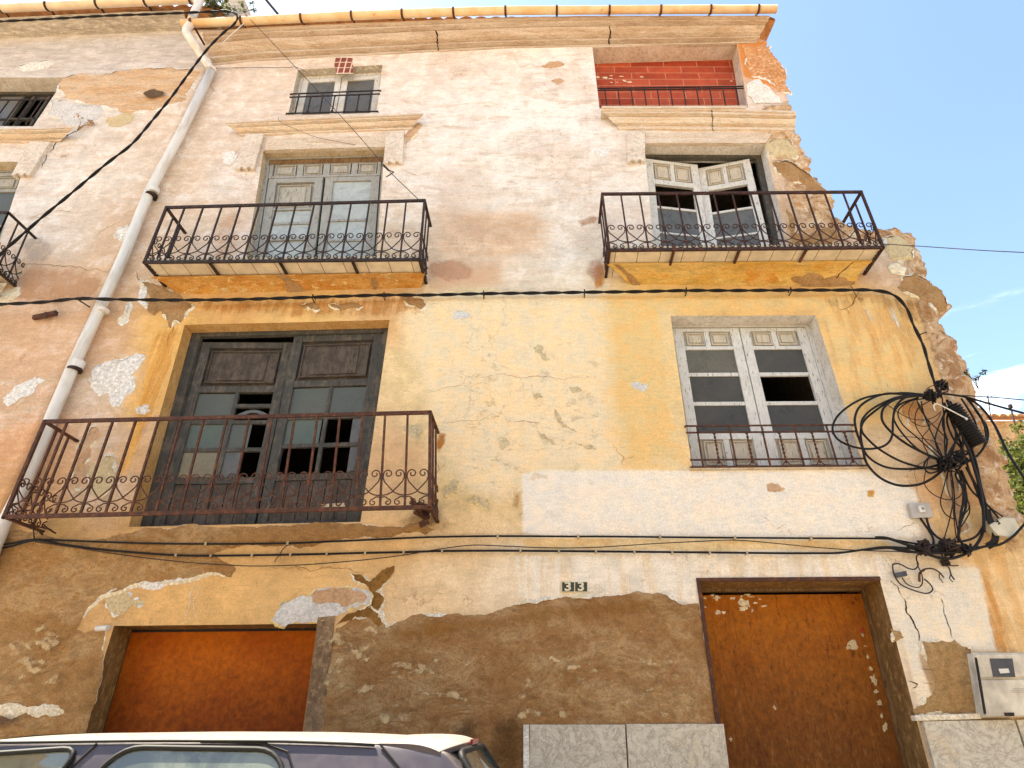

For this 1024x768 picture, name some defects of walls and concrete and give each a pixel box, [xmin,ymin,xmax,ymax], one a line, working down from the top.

spalling [47,67,200,127]
peeling [742,45,792,104]
peeling [117,278,220,328]
peeling [3,377,45,406]
peeling [89,353,146,407]
peeling [0,522,434,739]
crack [890,580,920,639]
peeling [269,566,767,768]
peeling [913,637,976,715]